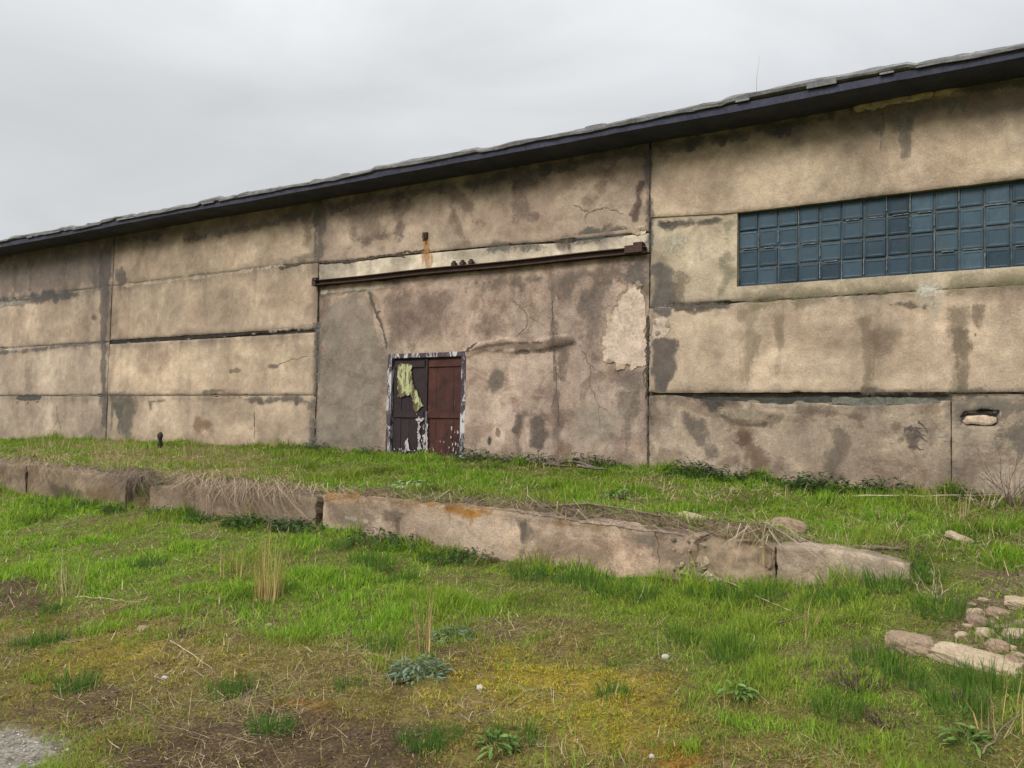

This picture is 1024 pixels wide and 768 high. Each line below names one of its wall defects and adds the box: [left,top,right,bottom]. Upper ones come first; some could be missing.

leakage [899,108,913,158]
corrosion [422,232,432,268]
leakage [0,244,222,439]
crack [368,292,387,348]
crack [581,350,611,430]
flaking render [600,280,728,371]
leakage [651,338,679,391]
leakage [953,308,1024,452]